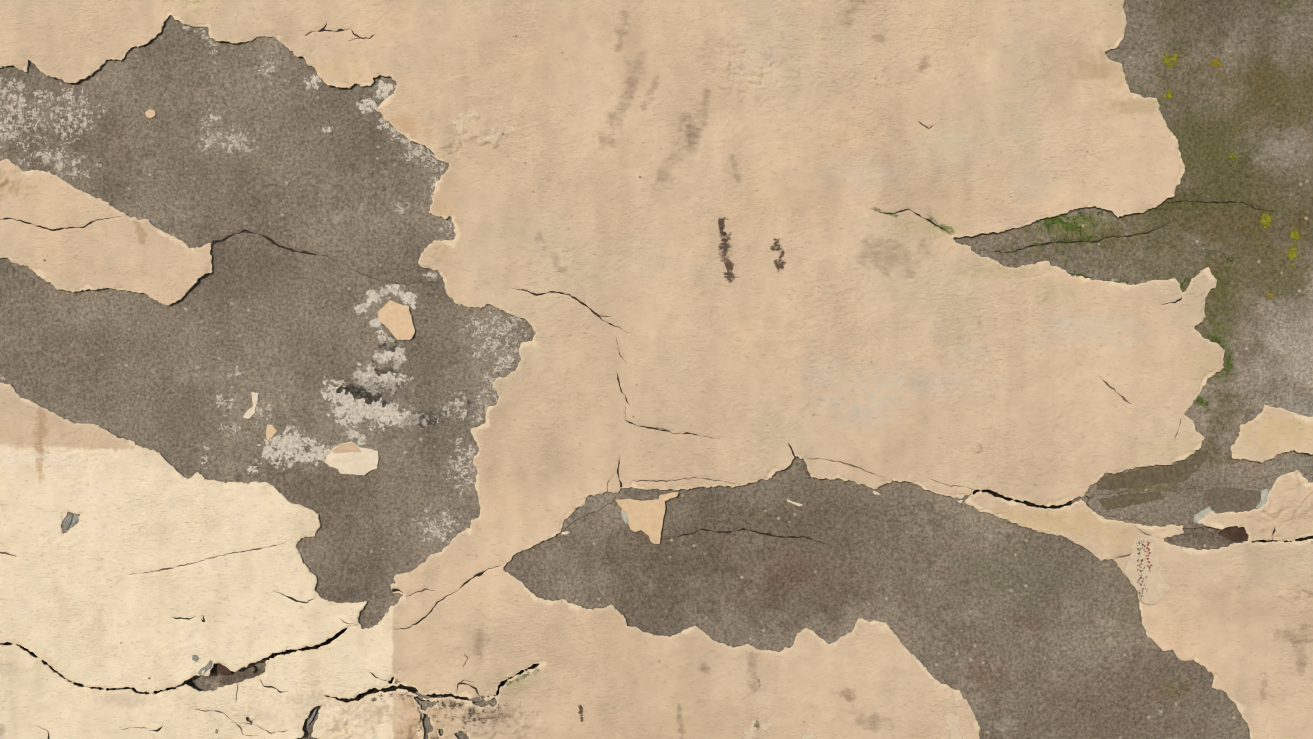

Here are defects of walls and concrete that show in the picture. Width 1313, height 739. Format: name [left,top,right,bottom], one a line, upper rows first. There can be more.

leakage [355,80,448,202]
crack [876,209,949,233]
flaking render [0,15,536,628]
flaking render [504,0,1313,739]
leakage [216,284,529,545]
crack [607,461,741,491]
crack [931,479,1090,509]
crack [0,619,353,736]
flaking render [178,653,276,691]
crack [328,655,539,703]
flaking render [297,696,328,739]
flaking render [414,691,469,739]